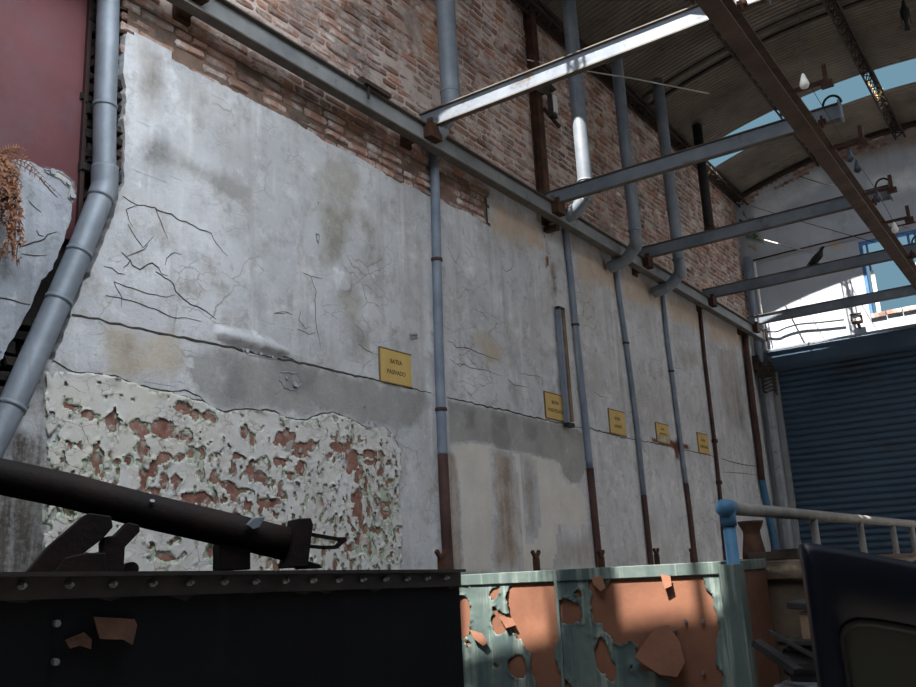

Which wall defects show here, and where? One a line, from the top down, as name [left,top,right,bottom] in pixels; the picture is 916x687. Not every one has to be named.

leakage [95,144,434,437]
crack [53,196,758,476]
leakage [487,194,560,302]
peeling [42,371,403,571]
leakage [447,399,596,575]
corrosion [651,436,690,463]
peeling [459,583,536,687]
peeling [553,574,685,687]
peeling [701,574,732,687]